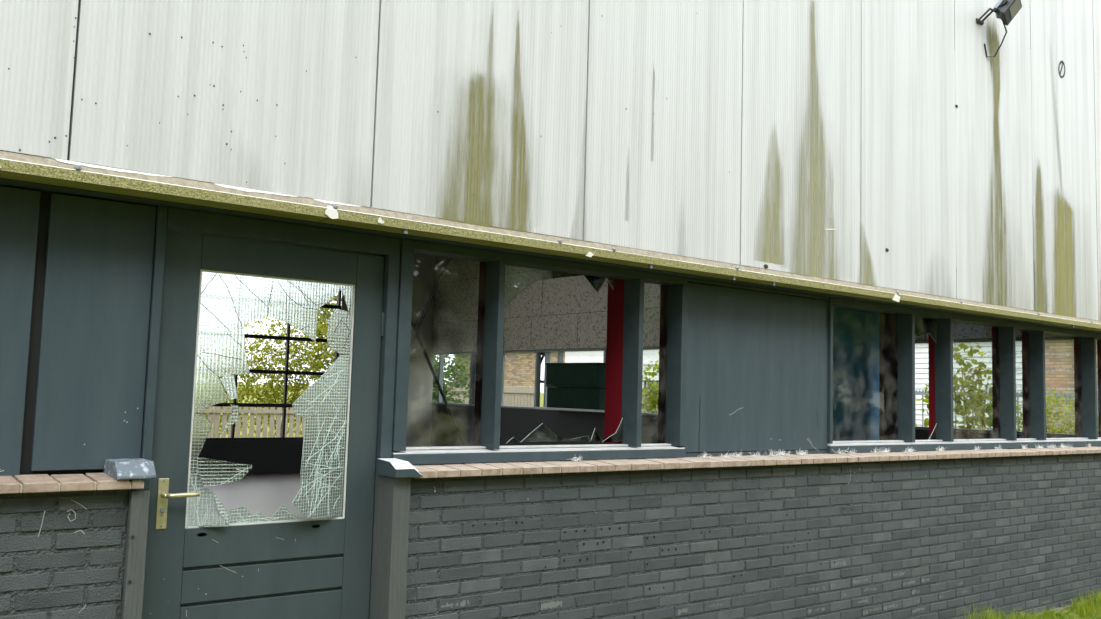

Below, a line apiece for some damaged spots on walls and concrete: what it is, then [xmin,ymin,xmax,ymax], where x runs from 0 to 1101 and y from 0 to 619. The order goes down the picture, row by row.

damp [973,17,1083,314]